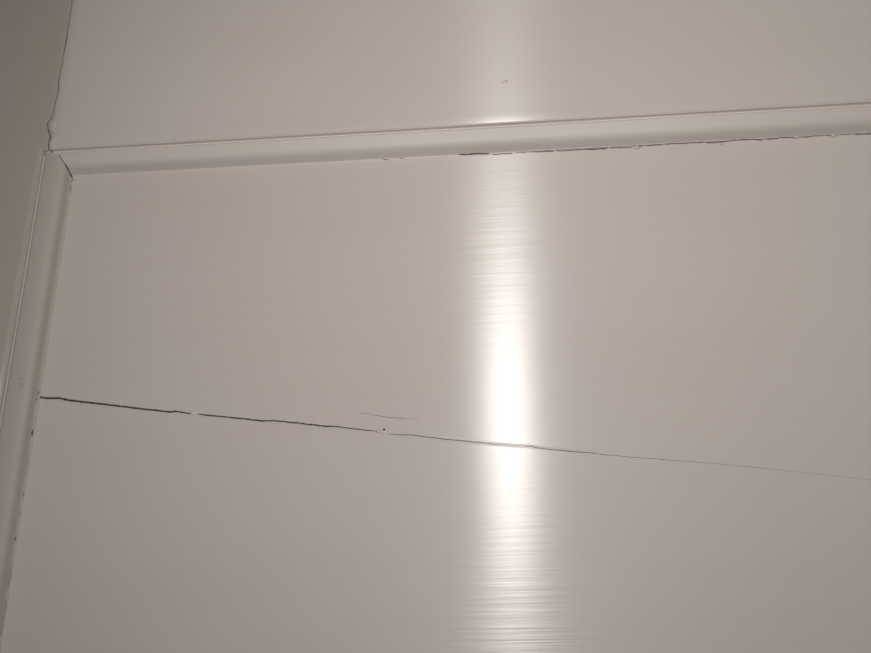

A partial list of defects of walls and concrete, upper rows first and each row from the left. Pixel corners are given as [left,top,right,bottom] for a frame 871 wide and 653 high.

crack [44,2,77,190]
crack [36,391,869,480]